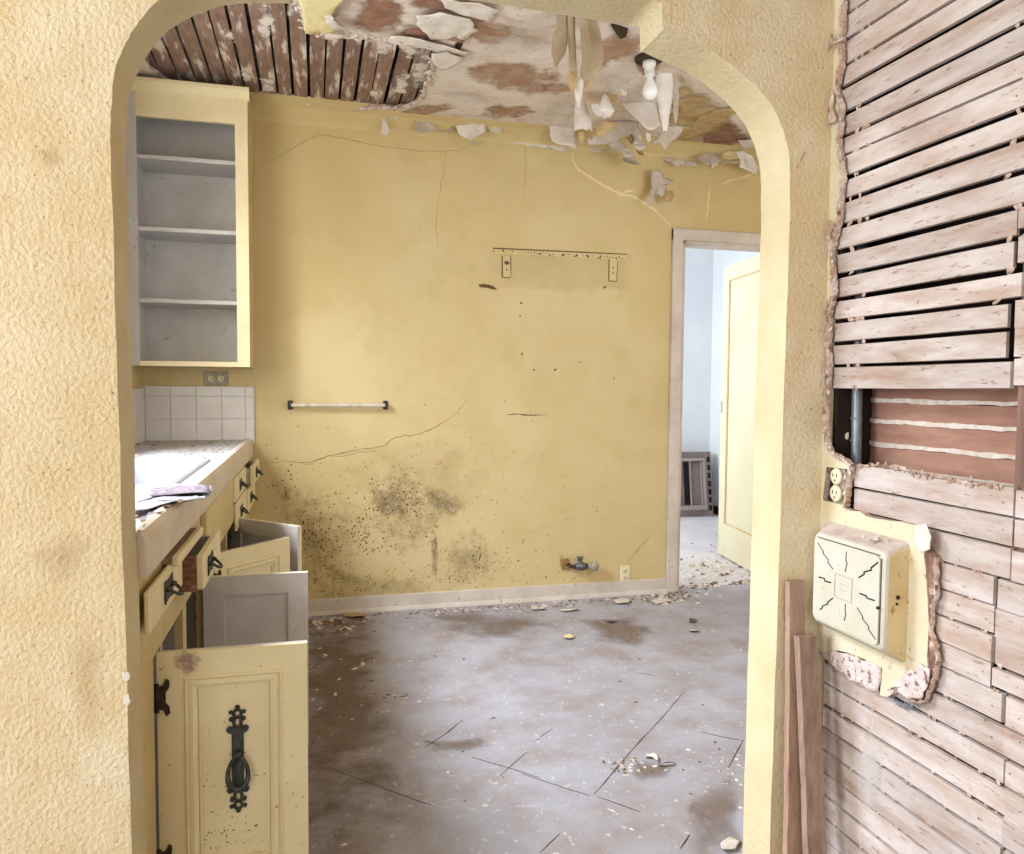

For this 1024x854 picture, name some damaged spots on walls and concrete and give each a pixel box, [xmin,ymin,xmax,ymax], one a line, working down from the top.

flaking render [146,0,438,136]
damp [402,105,451,115]
damp [355,0,570,94]
damp [488,105,534,117]
peeling [414,121,611,152]
spalling [611,23,628,39]
peeling [591,73,698,167]
crack [252,132,468,244]
crack [572,152,672,228]
crack [267,401,466,465]
flaking render [820,0,1024,854]
damp [261,436,547,596]